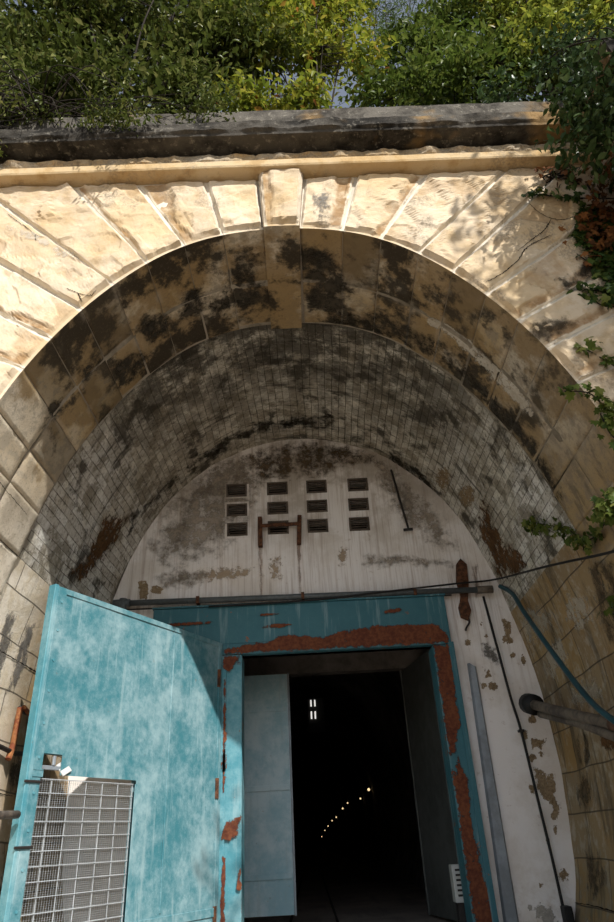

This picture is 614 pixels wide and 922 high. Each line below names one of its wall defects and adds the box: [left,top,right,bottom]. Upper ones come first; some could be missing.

crack [486,204,573,282]
damp [136,247,266,343]
damp [48,400,61,420]
damp [115,353,147,389]
damp [301,248,562,502]
damp [127,412,449,587]
corrosion [478,499,527,580]
damp [0,612,36,693]
corrosion [221,613,492,922]
peeling [523,715,562,842]